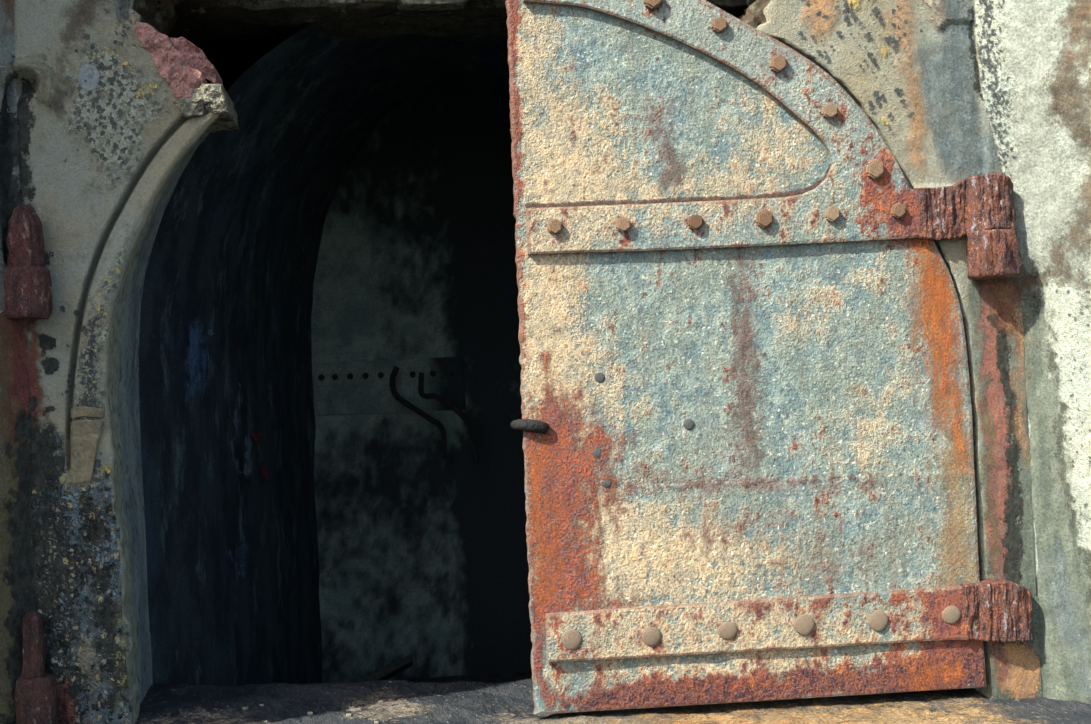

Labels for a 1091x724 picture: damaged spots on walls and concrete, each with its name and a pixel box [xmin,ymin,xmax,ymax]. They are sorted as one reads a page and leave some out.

rust [525,239,1040,724]